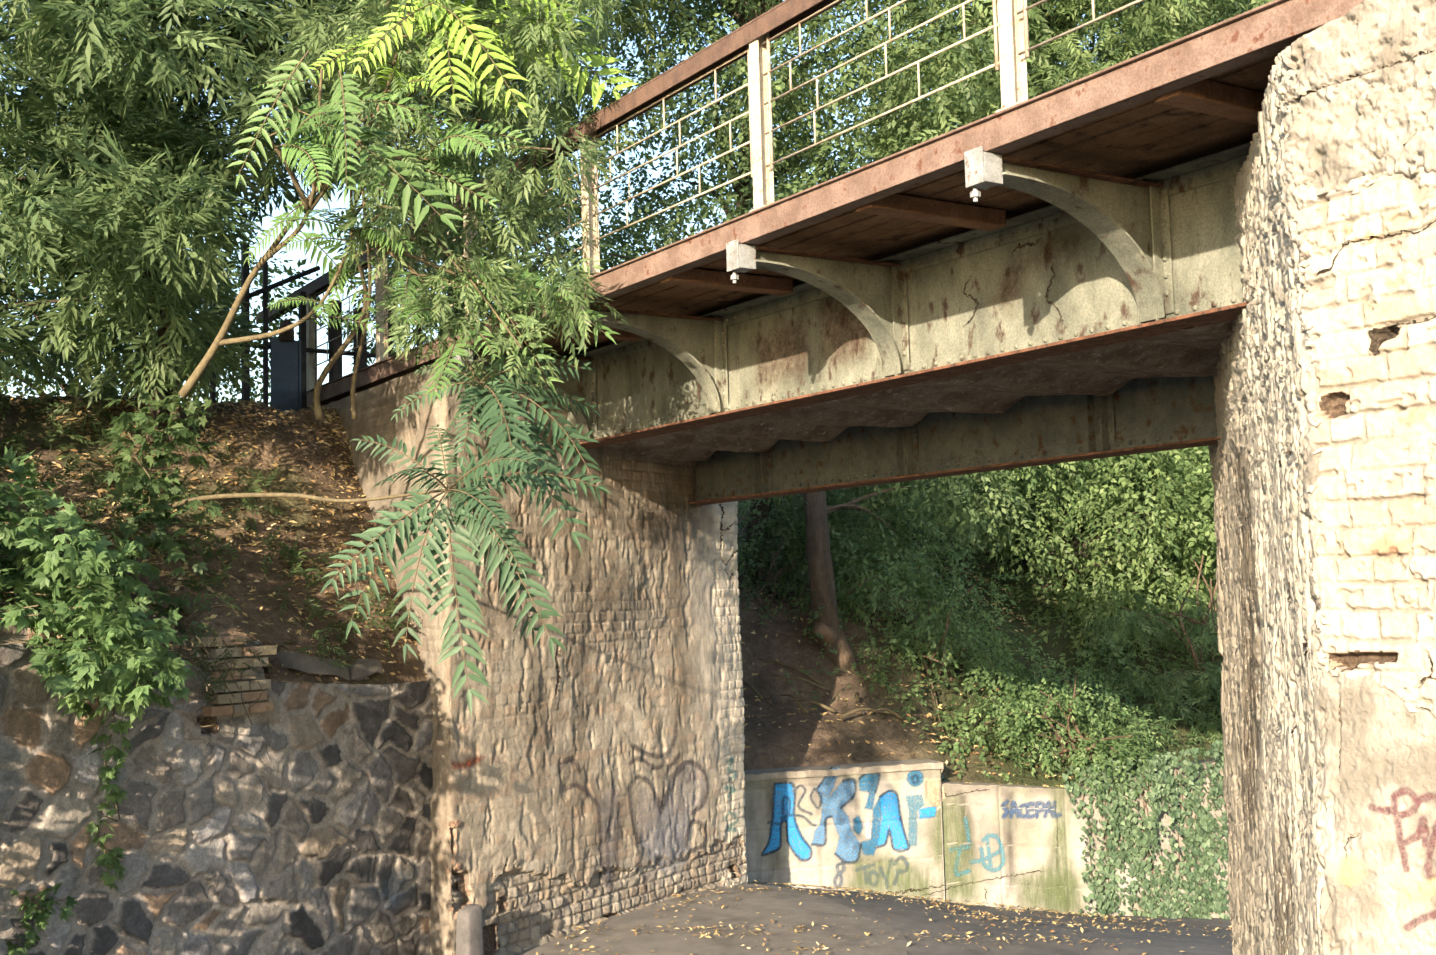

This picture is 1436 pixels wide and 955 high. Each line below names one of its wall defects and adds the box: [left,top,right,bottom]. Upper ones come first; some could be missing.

spalling [1296,165,1436,718]
spalling [446,815,747,955]